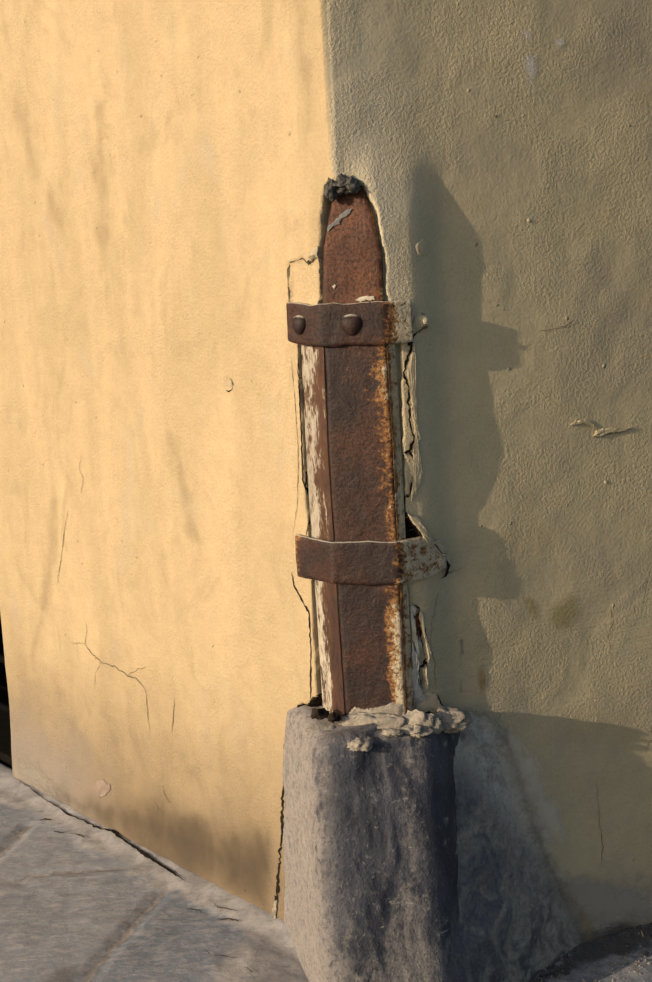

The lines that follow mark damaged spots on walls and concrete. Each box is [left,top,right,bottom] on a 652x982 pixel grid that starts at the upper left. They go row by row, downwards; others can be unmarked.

crack [403,313,425,512]
flaking render [404,497,456,579]
crack [70,626,175,730]
spalling [296,693,323,708]
flaking render [410,606,446,713]
crack [16,778,184,880]
crack [272,786,285,919]
crack [190,903,243,932]